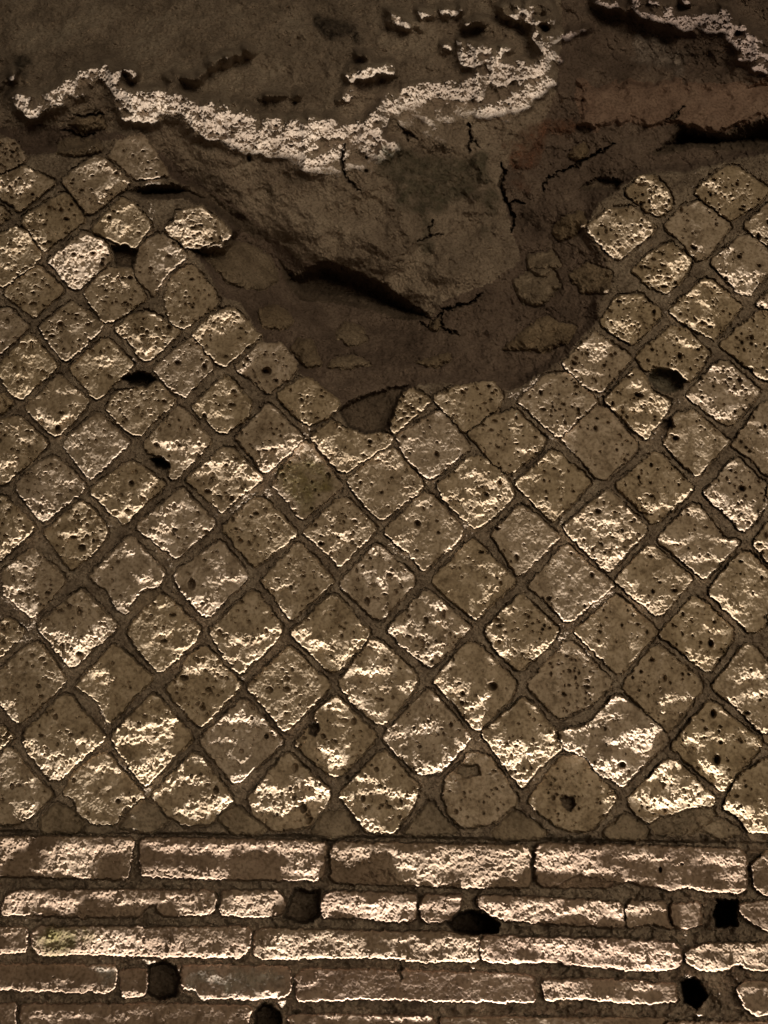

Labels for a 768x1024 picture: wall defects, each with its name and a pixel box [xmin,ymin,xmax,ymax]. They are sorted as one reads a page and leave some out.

spalling [0,114,127,158]
crack [498,143,616,233]
spalling [122,0,768,434]
spalling [111,245,138,269]
crack [420,293,484,336]
spalling [284,888,321,924]
spalling [447,911,500,936]
spalling [713,899,739,928]
spalling [147,961,181,1000]
spalling [679,978,708,1010]